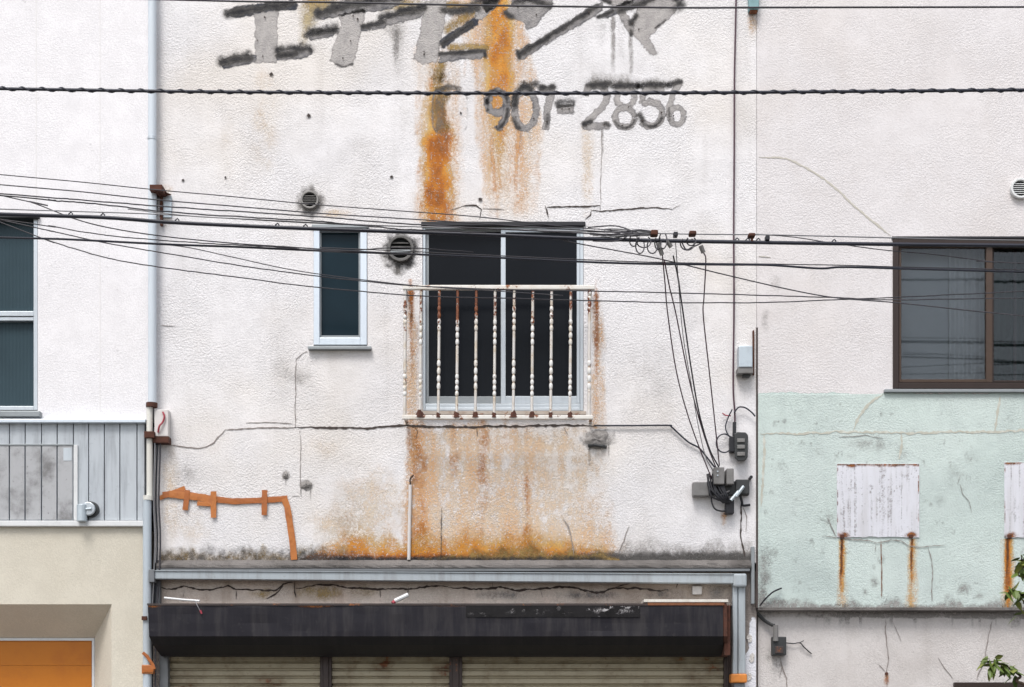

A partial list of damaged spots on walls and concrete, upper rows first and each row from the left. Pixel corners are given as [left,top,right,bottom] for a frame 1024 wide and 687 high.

corrosion [417,66,458,221]
corrosion [450,0,540,209]
crack [545,129,677,218]
crack [761,156,891,236]
crack [173,351,590,491]
corrosion [300,291,615,560]
crack [740,394,1024,556]
crack [161,582,678,599]
corrosion [837,519,848,607]
corrosion [907,532,916,607]
corrosion [1002,533,1015,607]
crack [879,623,901,672]